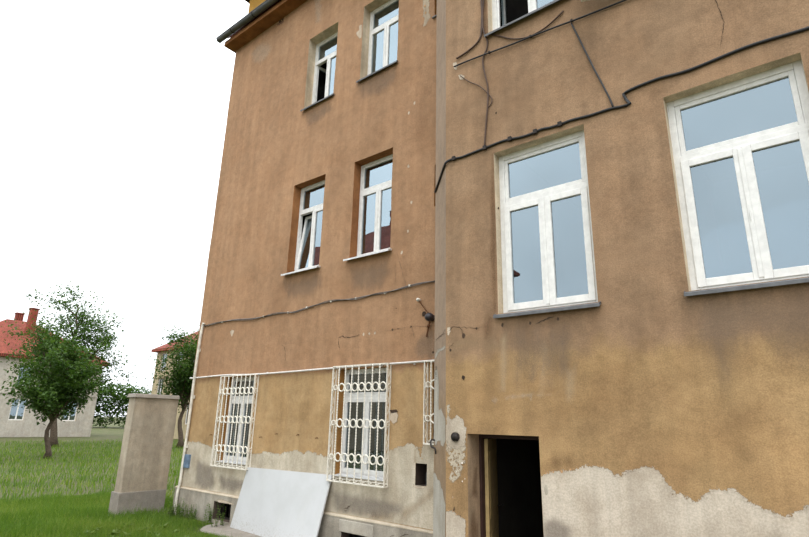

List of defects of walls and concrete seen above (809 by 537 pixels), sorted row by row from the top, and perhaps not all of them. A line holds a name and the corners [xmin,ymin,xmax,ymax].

flaking render [423,0,431,27]
flaking render [179,370,466,537]
flaking render [541,465,809,537]